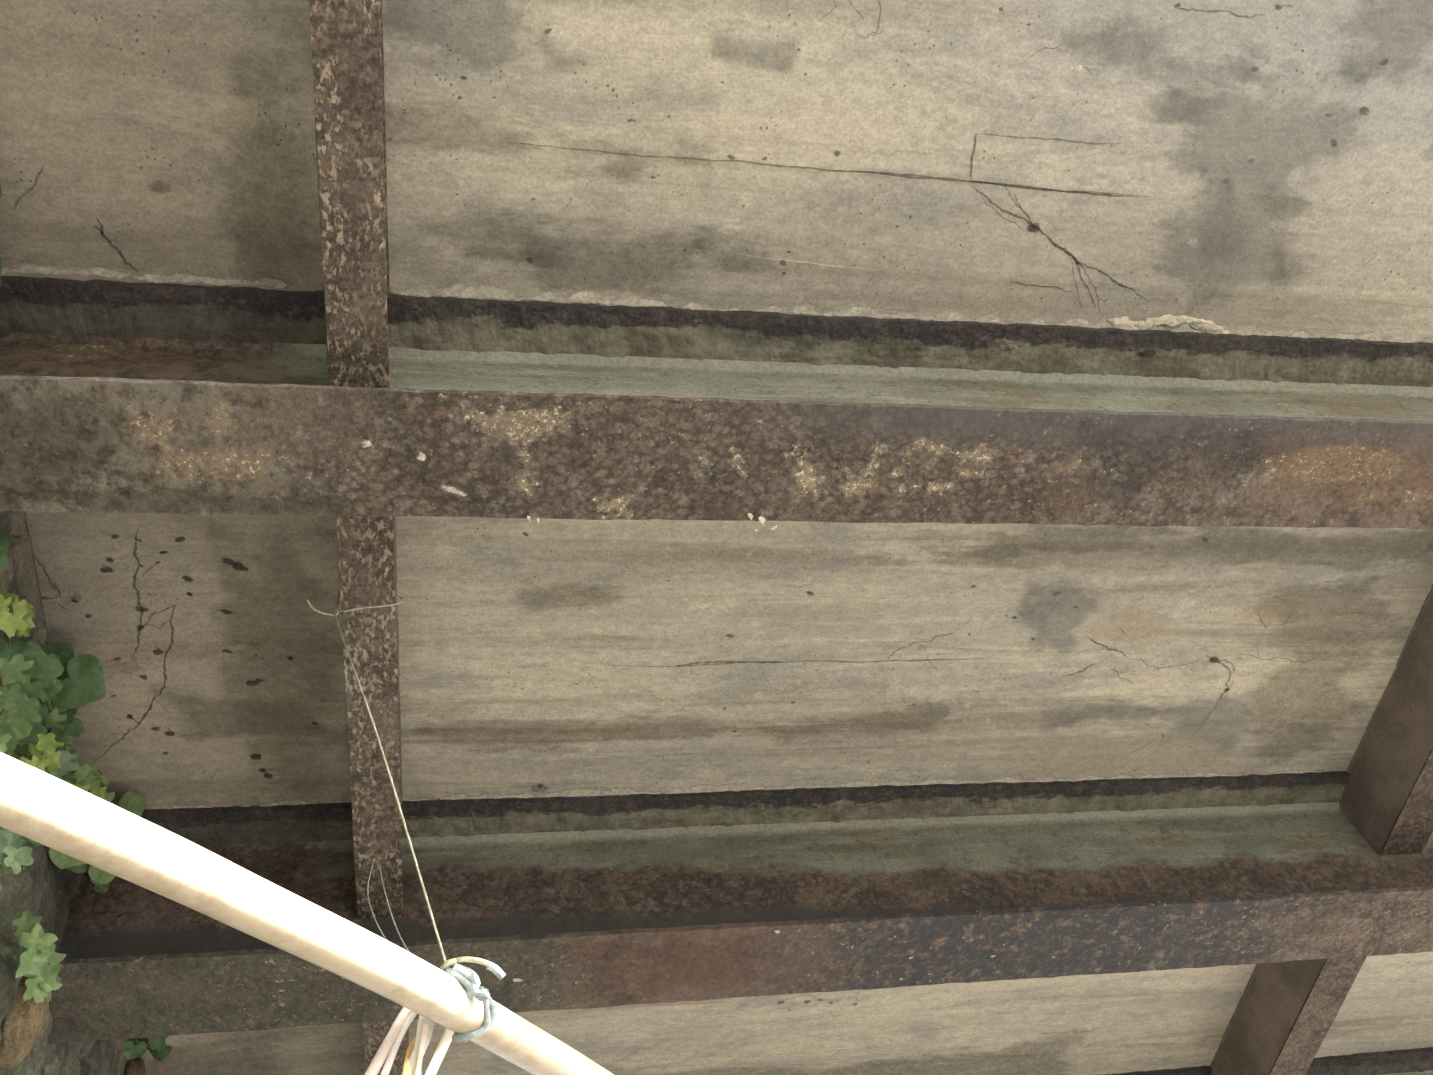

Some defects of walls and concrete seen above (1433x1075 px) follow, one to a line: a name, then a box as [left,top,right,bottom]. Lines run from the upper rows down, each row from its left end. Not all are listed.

crack [94,217,138,273]
crack [970,133,1147,307]
leakage [390,284,1433,343]
crack [89,529,176,764]
crack [1198,655,1235,730]